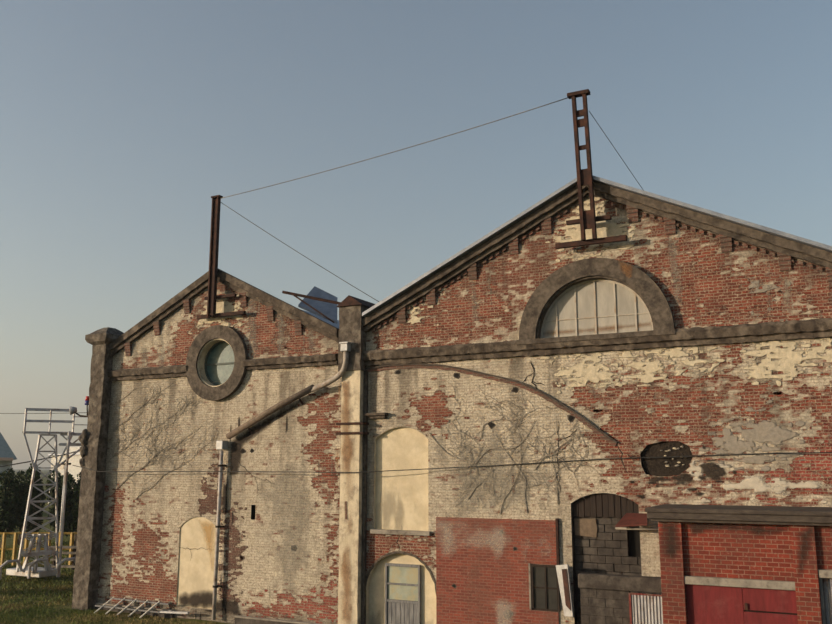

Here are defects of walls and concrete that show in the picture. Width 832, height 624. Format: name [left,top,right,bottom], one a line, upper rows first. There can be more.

peeling [164,290,321,366]
peeling [373,273,513,349]
peeling [401,377,469,439]
peeling [540,337,832,503]
peeling [104,482,177,608]
peeling [198,392,341,624]
water stain [179,576,239,620]